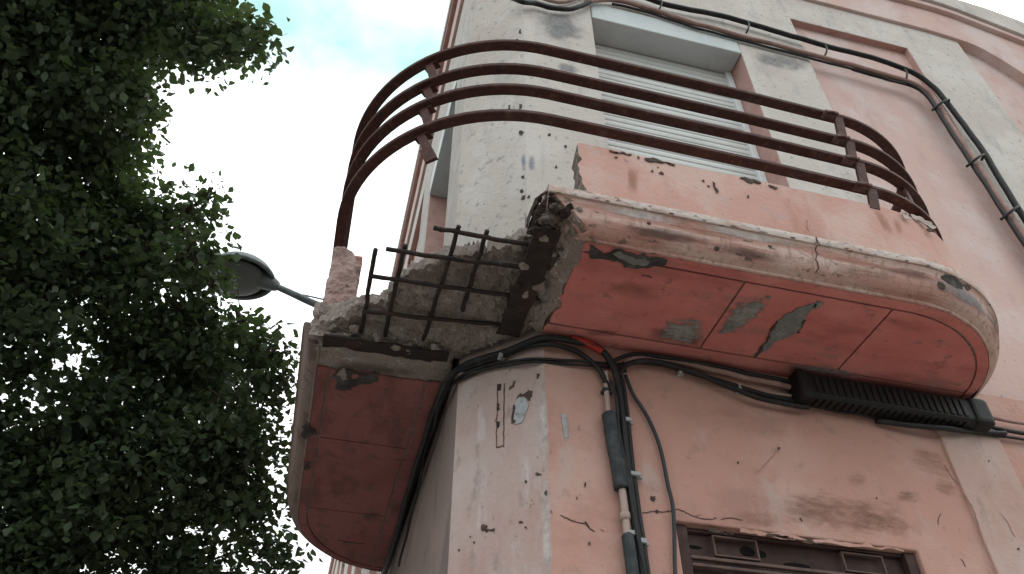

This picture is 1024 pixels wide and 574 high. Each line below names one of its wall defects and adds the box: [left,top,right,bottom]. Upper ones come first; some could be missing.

crack [807,221,819,274]
spalling [309,175,667,391]
spalling [937,274,971,291]
peeling [720,296,771,334]
peeling [754,300,823,358]
peeling [509,381,547,438]